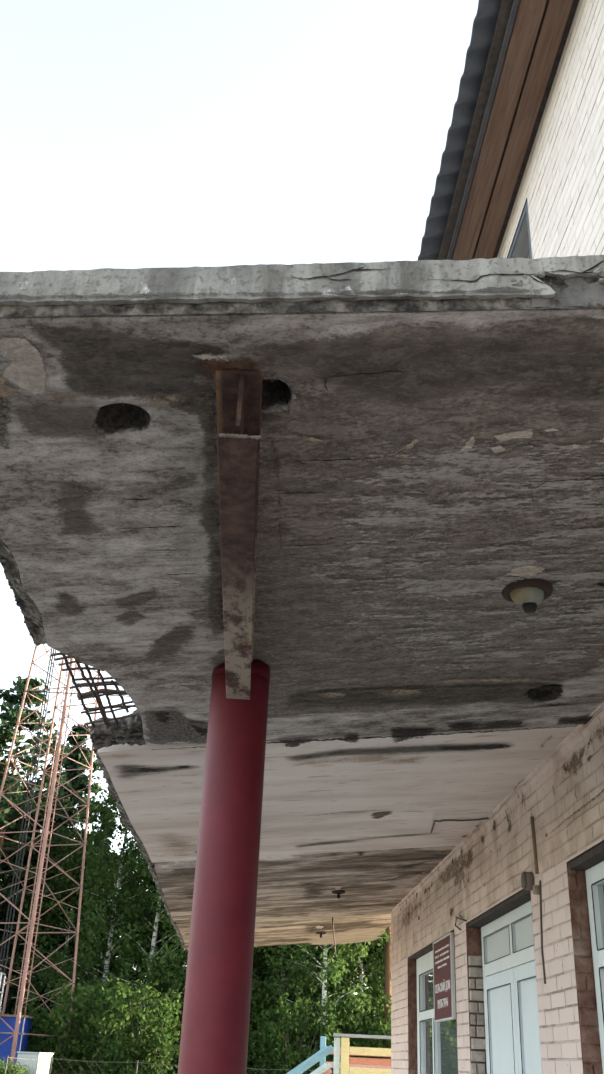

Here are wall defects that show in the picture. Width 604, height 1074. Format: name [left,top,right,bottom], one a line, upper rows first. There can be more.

spalling [0,268,604,308]
crack [292,266,392,280]
crack [432,261,604,284]
peeling [491,428,559,452]
rust [191,353,258,636]
water stain [14,317,604,723]
spalling [0,537,208,950]
water stain [291,744,510,765]
peeling [266,717,593,747]
water stain [564,727,604,775]
water stain [438,850,473,890]
peeling [305,870,442,945]